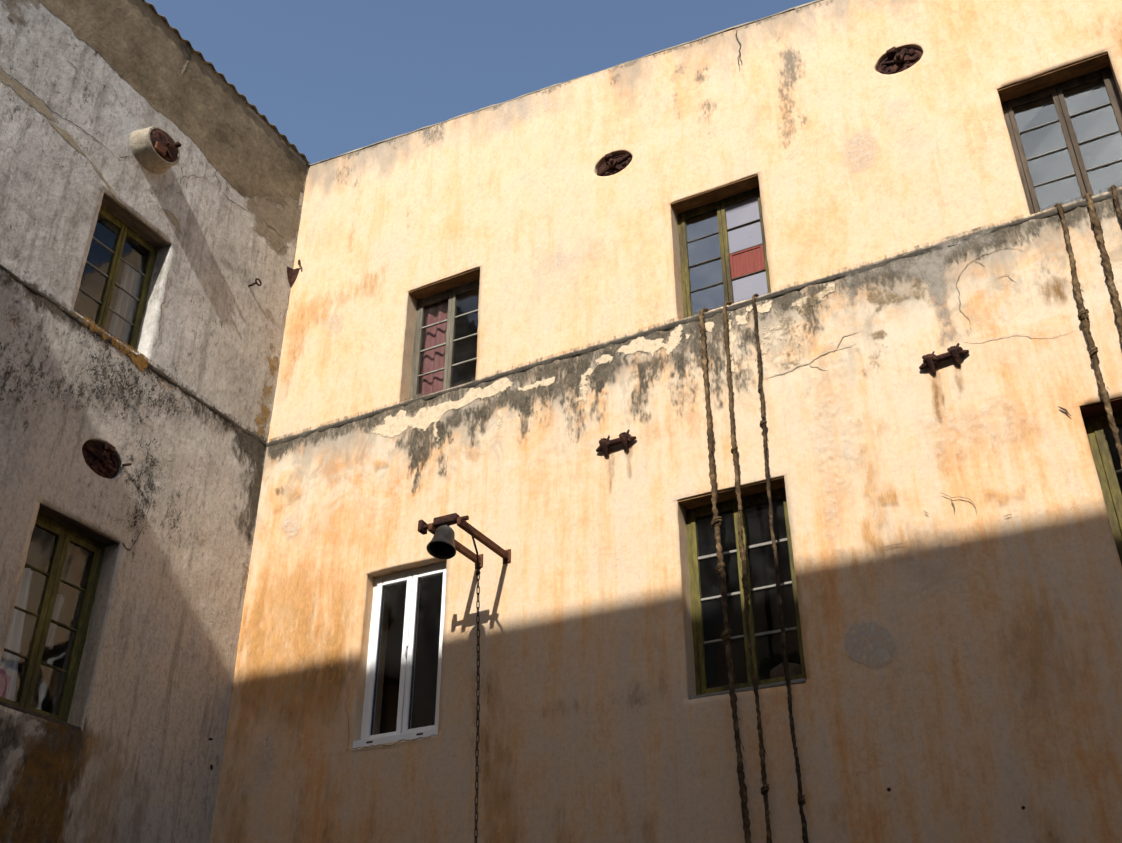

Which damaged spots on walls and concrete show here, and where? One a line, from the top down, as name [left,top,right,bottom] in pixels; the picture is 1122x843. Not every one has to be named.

crack [734,30,742,71]
crack [0,67,129,158]
damp [779,51,801,136]
crack [956,247,1025,329]
peeling [372,376,555,441]
damp [0,186,1122,588]
damp [242,570,347,725]
damp [0,713,27,780]